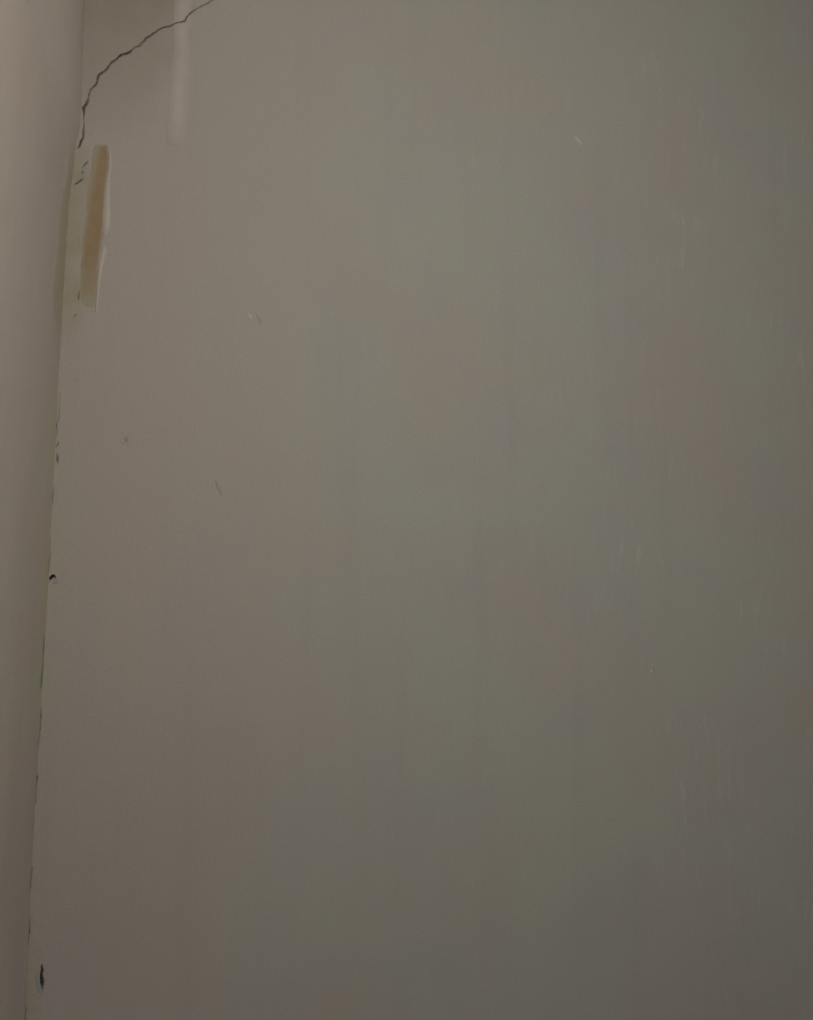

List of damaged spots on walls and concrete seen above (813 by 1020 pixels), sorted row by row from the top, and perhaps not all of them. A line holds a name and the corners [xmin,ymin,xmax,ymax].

crack [79,9,195,147]
peeling [80,144,111,313]